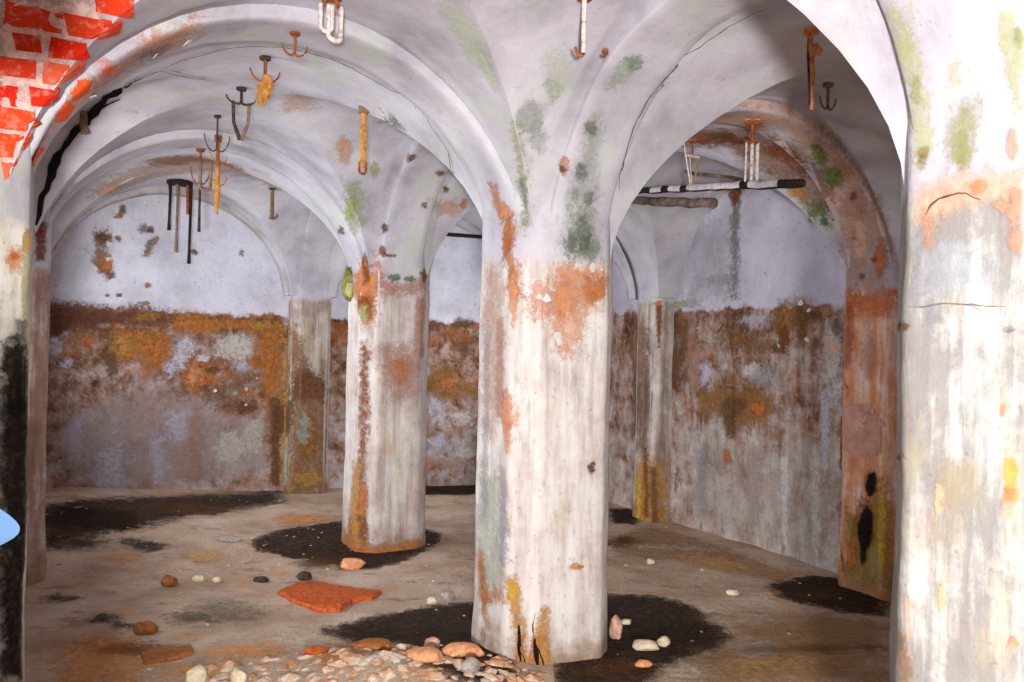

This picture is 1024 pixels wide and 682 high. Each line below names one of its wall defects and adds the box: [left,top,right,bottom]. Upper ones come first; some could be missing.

flaking render [0,0,205,182]
crack [35,46,453,225]
rust [490,184,525,327]
water stain [893,12,934,164]
crack [925,192,980,216]
water stain [947,108,976,171]
rust [383,297,425,402]
water stain [45,411,288,553]
rust [268,345,422,553]
spalling [855,471,876,565]
rust [842,476,895,588]
crack [517,615,544,665]